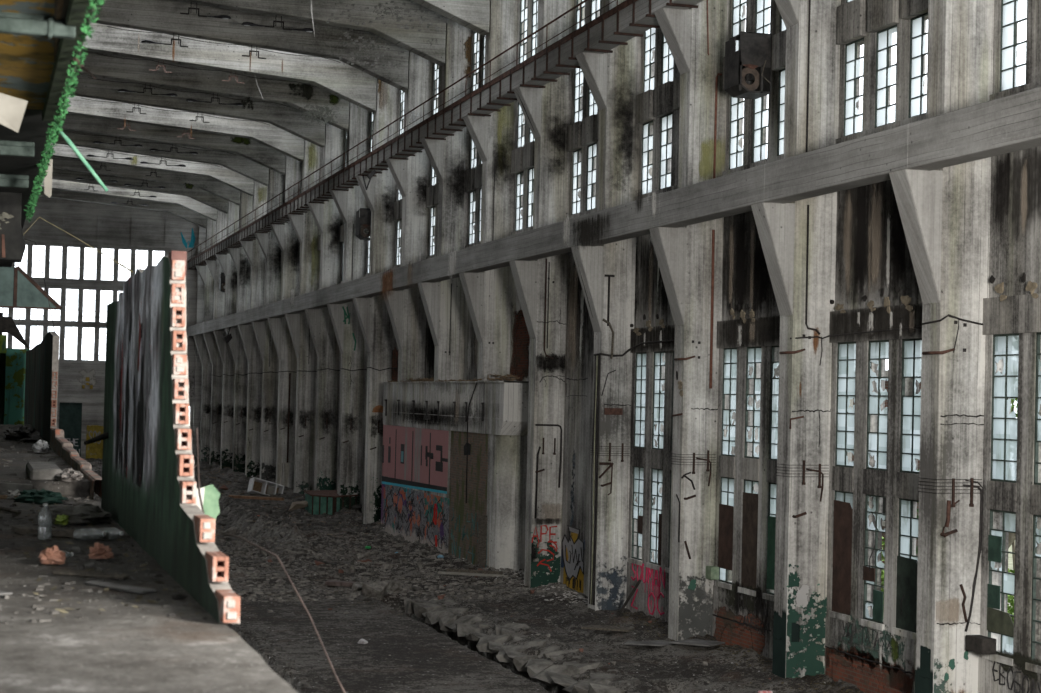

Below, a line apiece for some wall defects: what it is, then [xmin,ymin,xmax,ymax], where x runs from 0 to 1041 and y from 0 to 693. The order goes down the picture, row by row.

flaking render [510,306,530,381]
peeling [678,564,969,693]